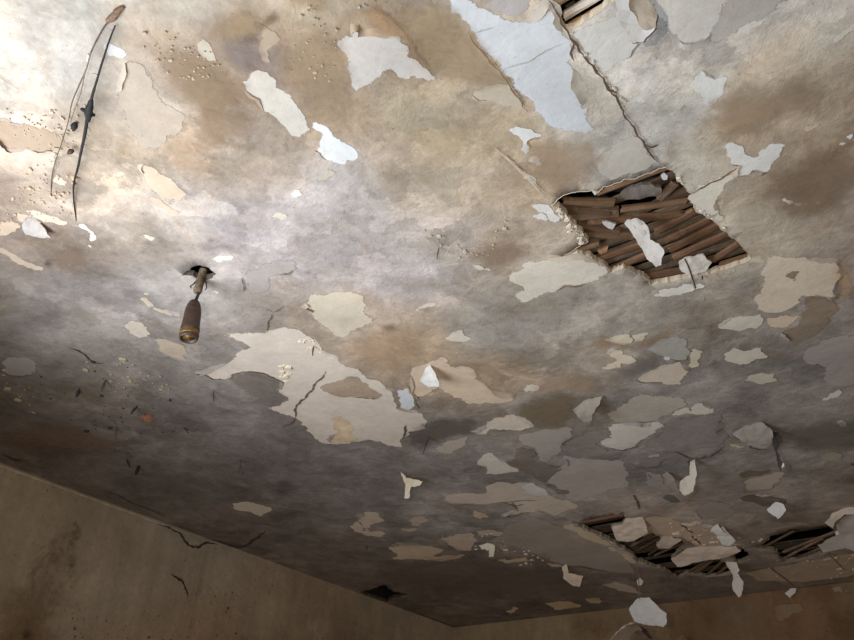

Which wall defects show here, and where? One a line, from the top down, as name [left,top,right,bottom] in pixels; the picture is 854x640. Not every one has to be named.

peeling [243,23,358,164]
peeling [337,24,443,91]
peeling [449,0,641,135]
crack [470,0,668,169]
peeling [650,0,787,51]
peeling [509,135,785,303]
crack [691,168,736,195]
peeling [300,291,372,338]
peeling [718,255,845,331]
peeling [194,327,541,447]
peeling [233,502,272,516]
peeling [389,333,854,627]